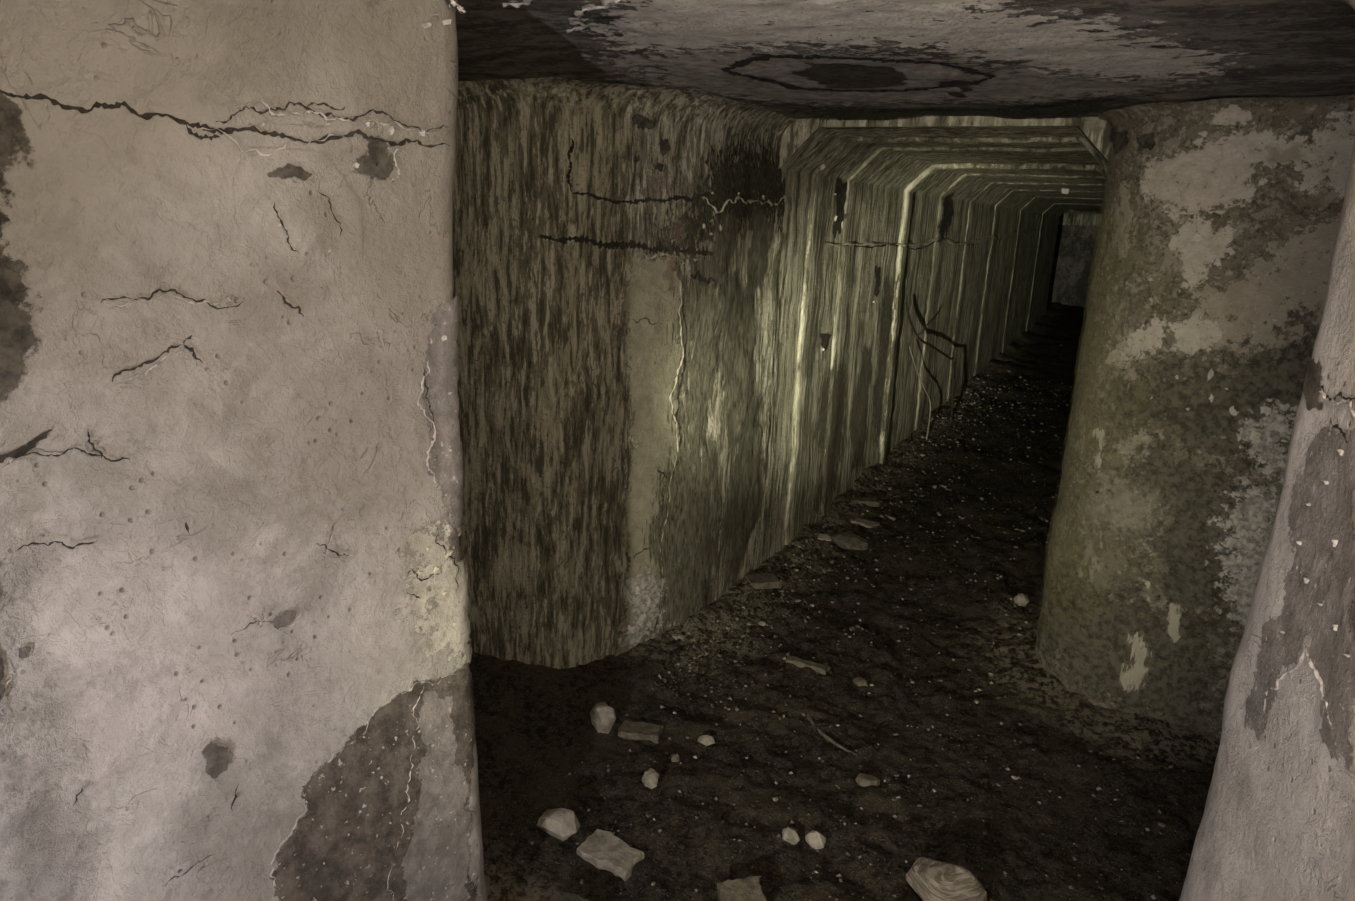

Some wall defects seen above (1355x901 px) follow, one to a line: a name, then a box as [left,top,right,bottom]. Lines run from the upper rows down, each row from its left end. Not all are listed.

damp [0,92,43,402]
crack [0,429,130,471]
crack [101,288,245,383]
crack [0,89,450,156]
crack [277,291,304,317]
spalling [269,295,477,901]
crack [538,138,786,264]
flaking render [613,253,717,657]
peeling [568,0,1257,109]
damp [1036,302,1319,738]
peeling [1105,104,1355,380]
flaking render [1244,356,1355,769]